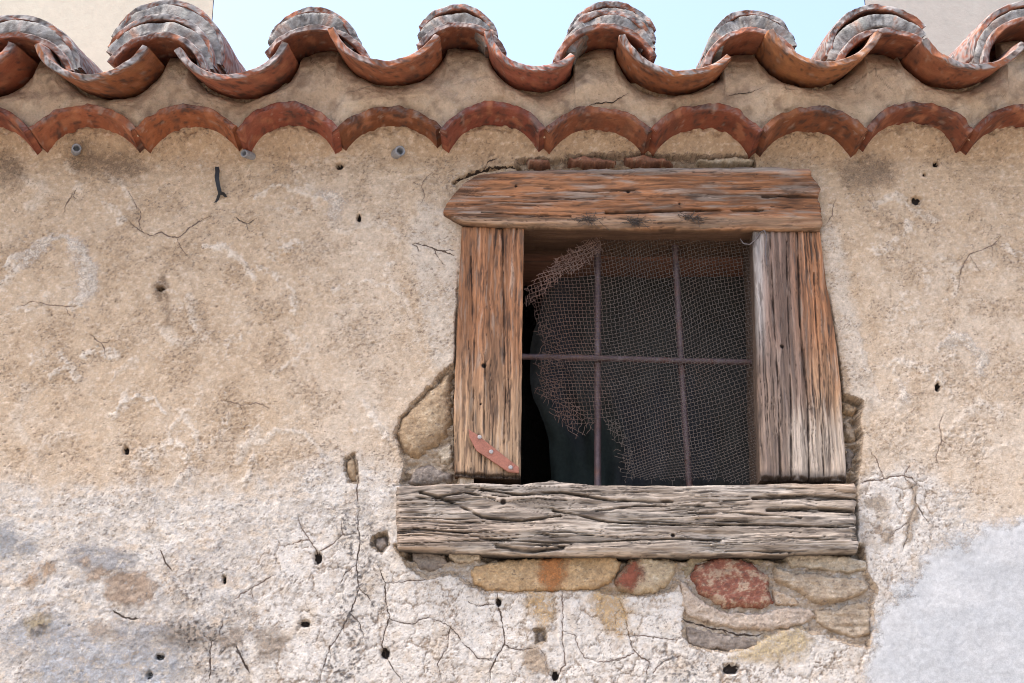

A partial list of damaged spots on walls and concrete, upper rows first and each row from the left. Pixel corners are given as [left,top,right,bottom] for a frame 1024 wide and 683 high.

crack [454,158,515,184]
crack [128,191,210,254]
crack [959,241,997,282]
spalling [343,453,359,484]
spalling [393,363,459,486]
spalling [841,394,864,484]
crack [861,452,930,548]
crack [295,460,763,683]
spalling [325,506,914,683]